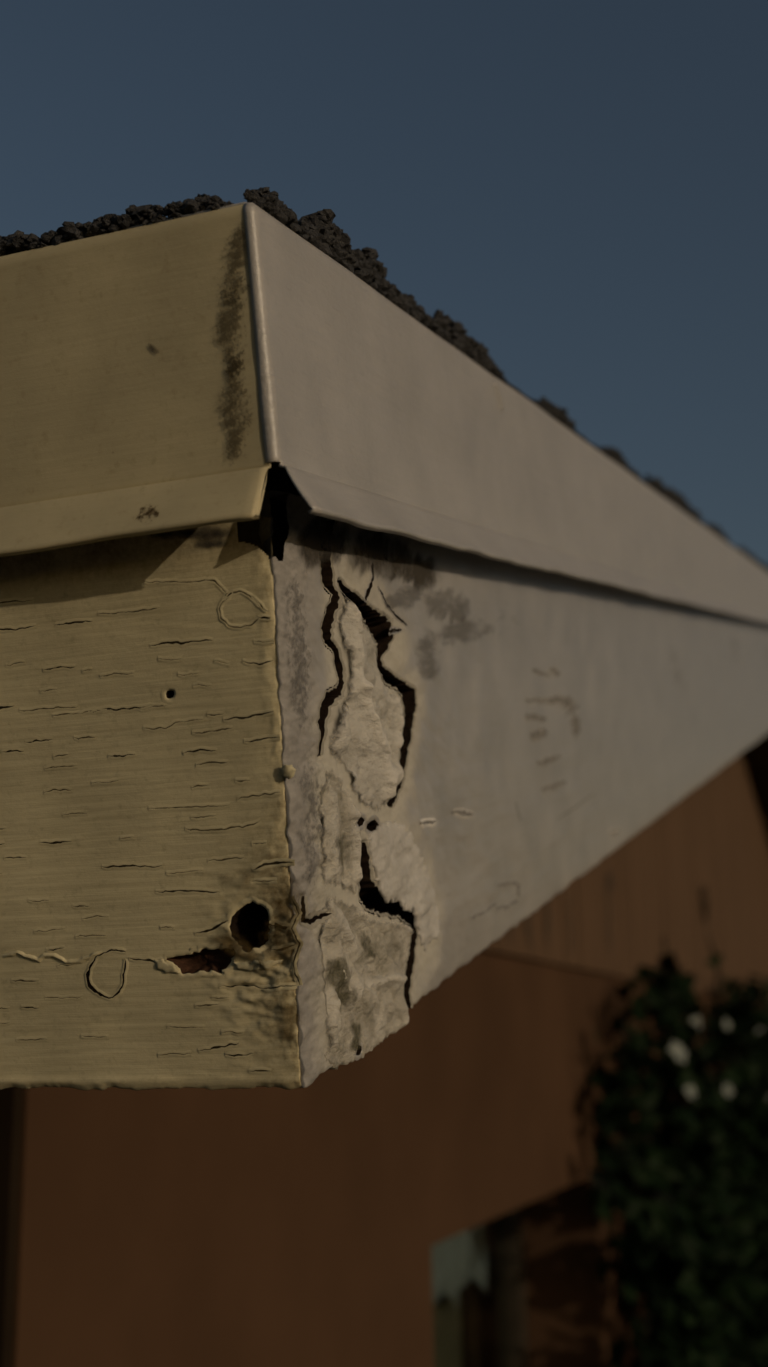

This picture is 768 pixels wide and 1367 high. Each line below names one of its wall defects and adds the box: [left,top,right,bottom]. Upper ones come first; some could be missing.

leakage [216,227,252,458]
crack [316,520,419,807]
crack [0,576,419,1075]
spalling [154,943,283,979]
peeling [356,811,440,951]